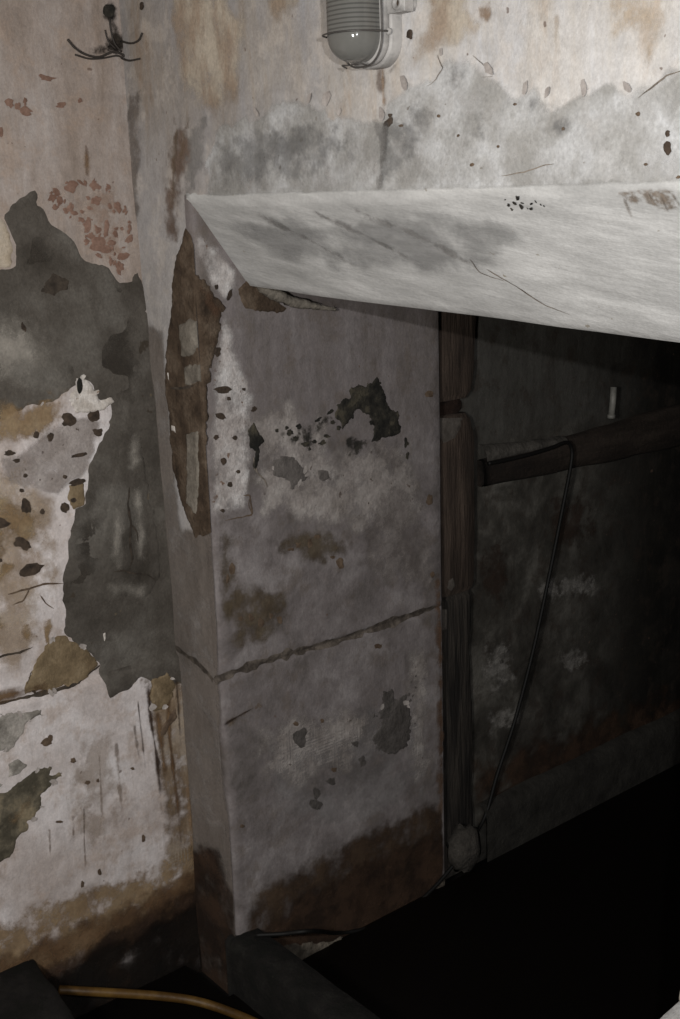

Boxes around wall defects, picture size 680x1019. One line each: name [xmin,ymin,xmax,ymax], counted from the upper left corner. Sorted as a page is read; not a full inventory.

spalling [0,178,433,737]
peeling [0,710,62,862]
leakage [0,327,286,1018]
crack [175,605,438,685]
peeling [259,652,429,810]
leakage [249,807,443,946]